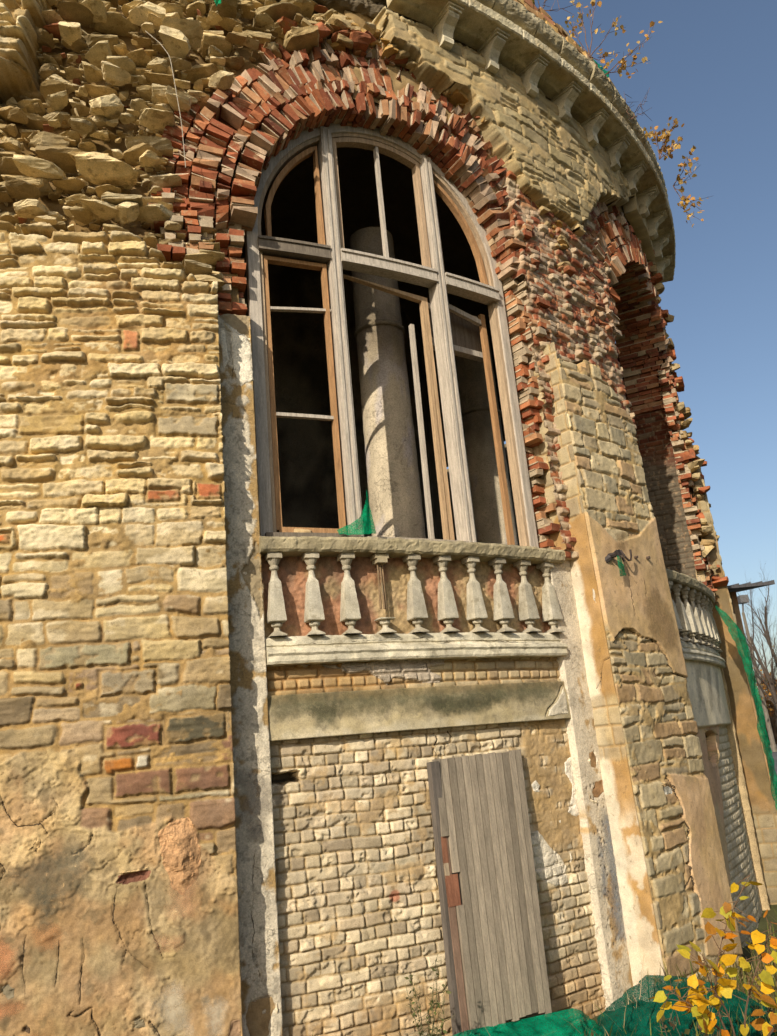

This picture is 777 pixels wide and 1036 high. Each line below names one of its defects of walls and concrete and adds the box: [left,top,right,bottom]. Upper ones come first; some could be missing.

spalling [647,249,729,592]
crack [2,801,58,851]
crack [112,885,163,967]
crack [55,940,100,1036]